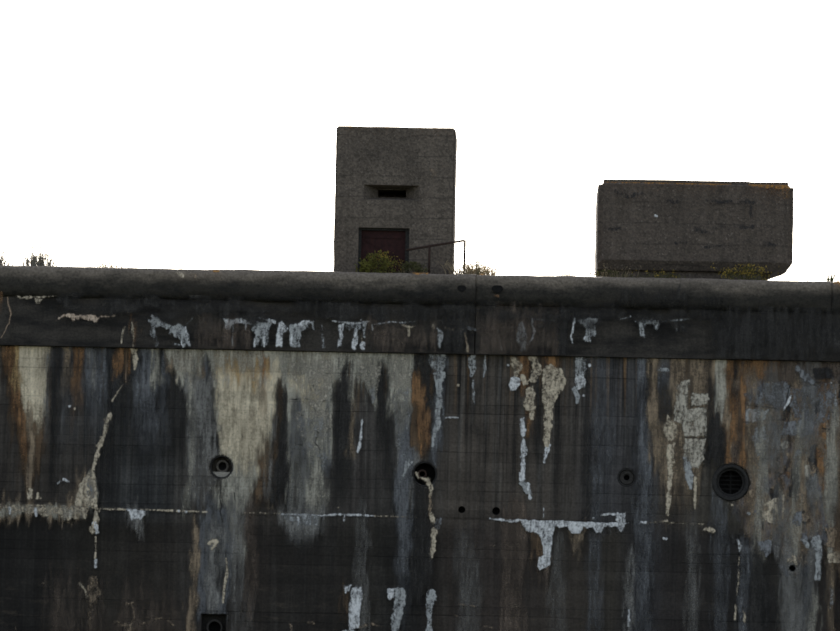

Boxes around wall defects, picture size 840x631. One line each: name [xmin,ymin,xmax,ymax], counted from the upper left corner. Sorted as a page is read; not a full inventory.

peeling [148,315,190,347]
peeling [578,317,598,342]
corrosion [1,346,52,504]
damp [0,495,127,524]
damp [52,294,476,631]
corrosion [409,354,436,456]
damp [468,303,719,631]
peeling [593,512,626,532]
peeling [647,359,710,516]